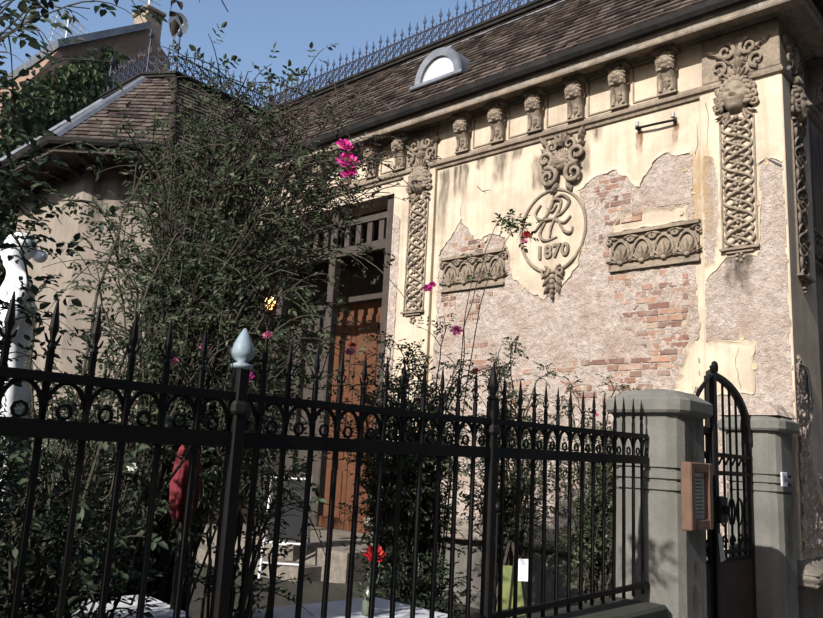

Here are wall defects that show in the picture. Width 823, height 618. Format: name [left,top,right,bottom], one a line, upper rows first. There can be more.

flaking render [426,147,823,557]